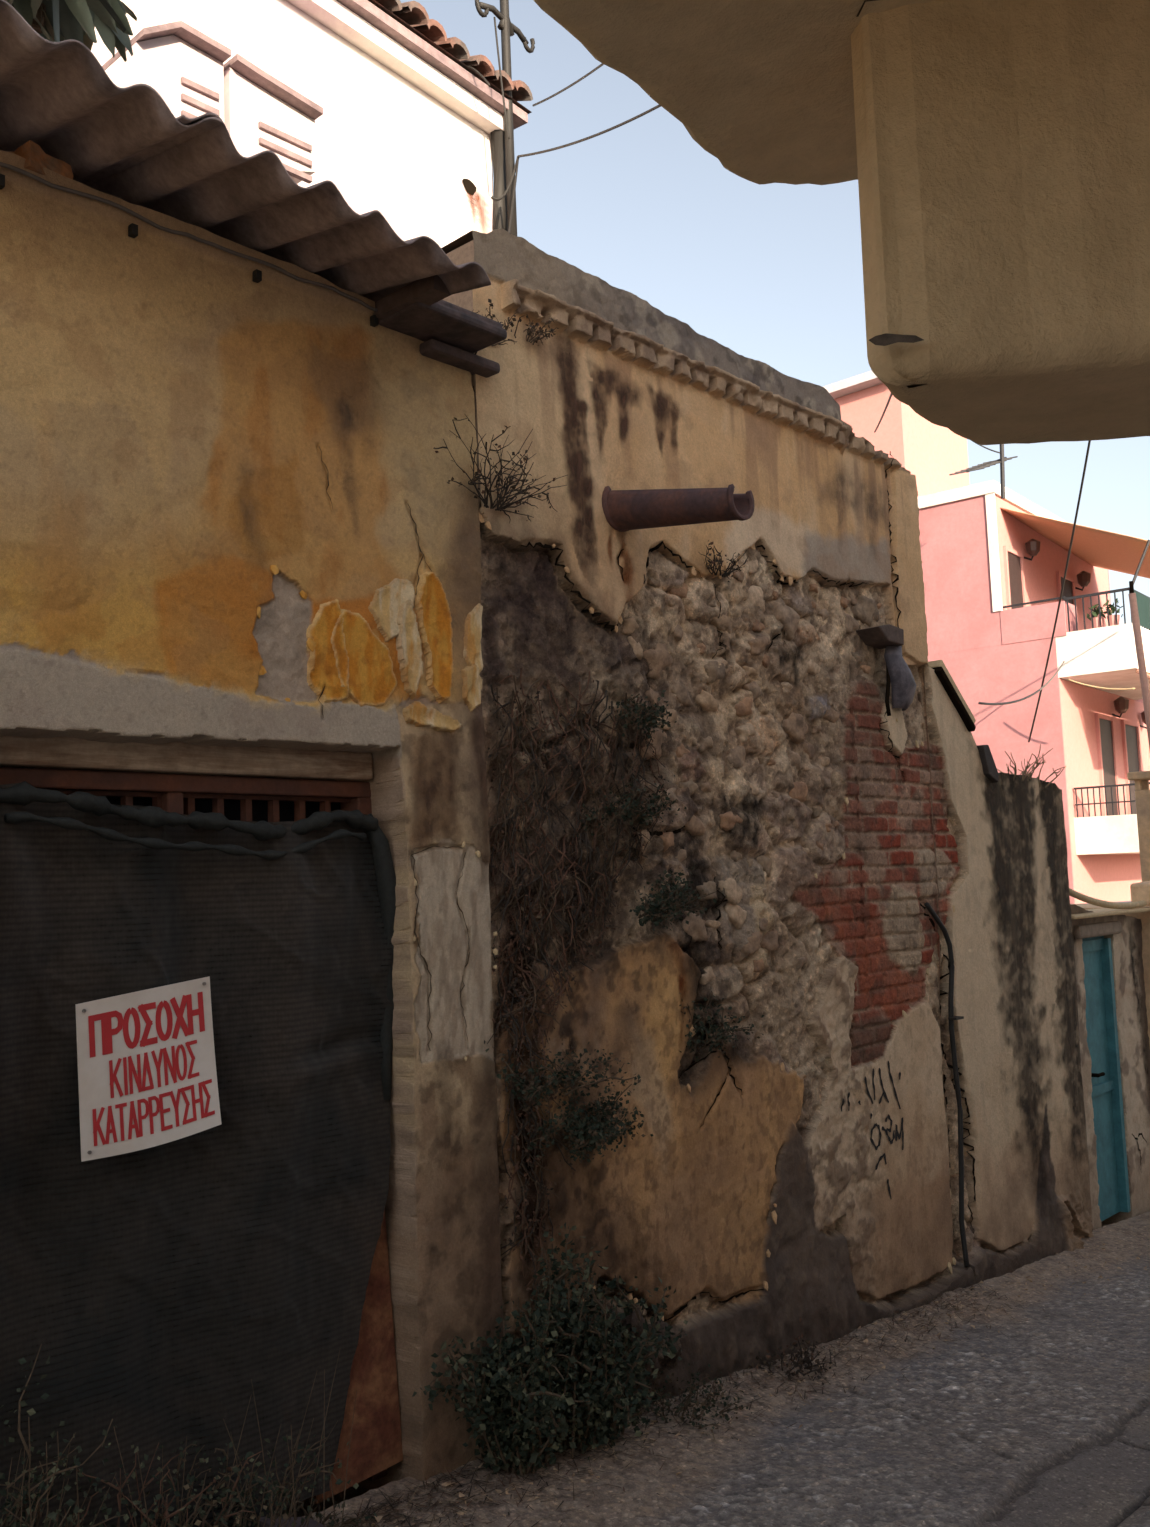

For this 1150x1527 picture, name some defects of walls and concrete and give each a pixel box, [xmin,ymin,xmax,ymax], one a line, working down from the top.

water stain [557,339,677,566]
spalling [252,513,1034,1373]
water stain [985,772,1087,1163]